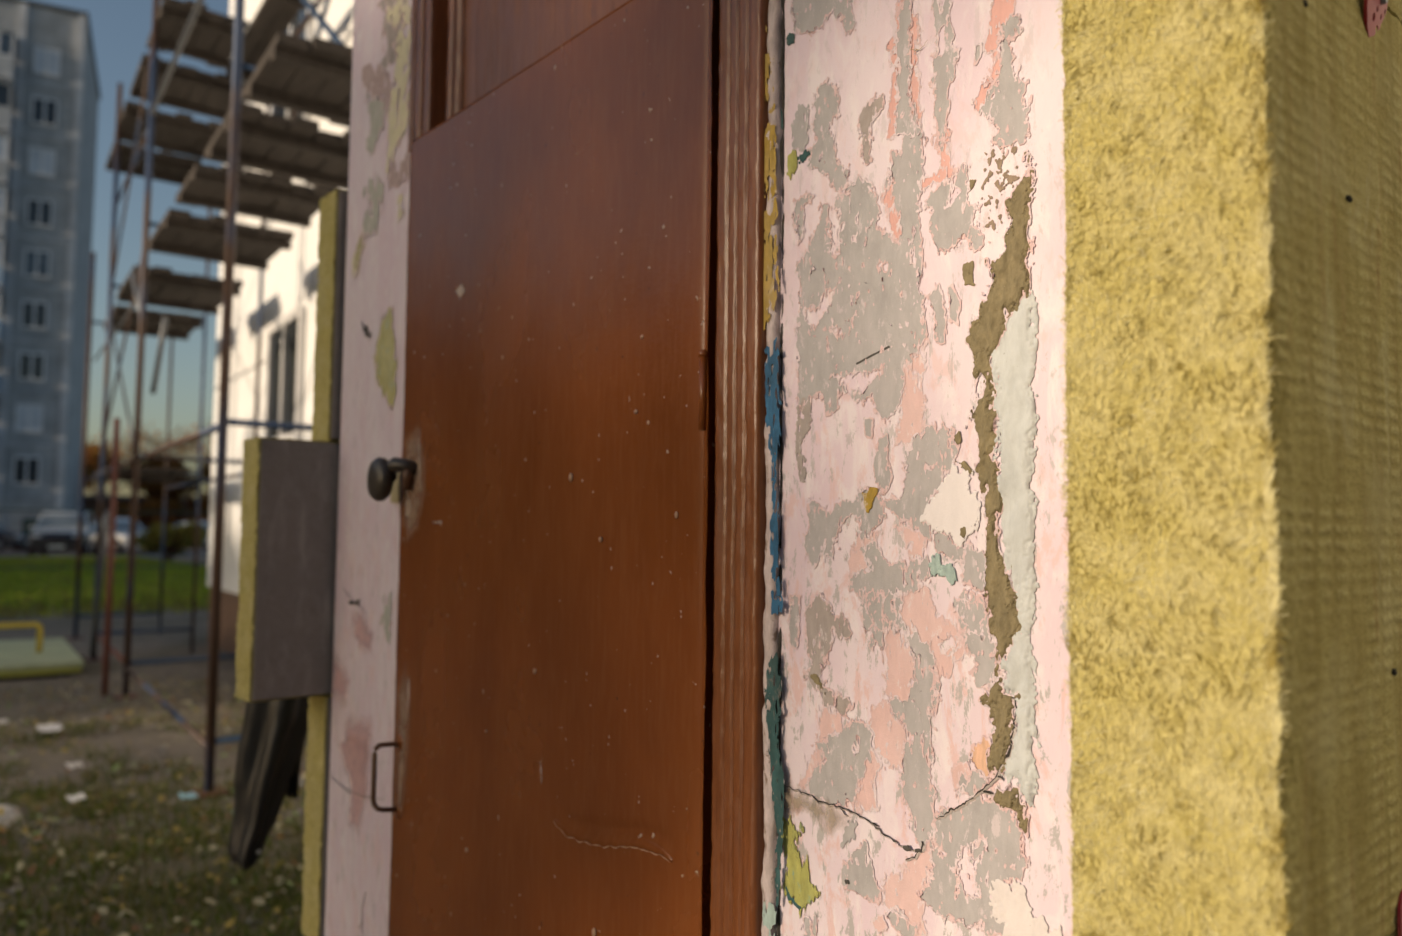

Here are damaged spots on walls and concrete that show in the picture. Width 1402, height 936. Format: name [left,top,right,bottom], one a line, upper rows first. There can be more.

peeling [362,305,398,411]
peeling [352,0,411,279]
crack [776,0,1017,936]
peeling [762,0,1037,936]